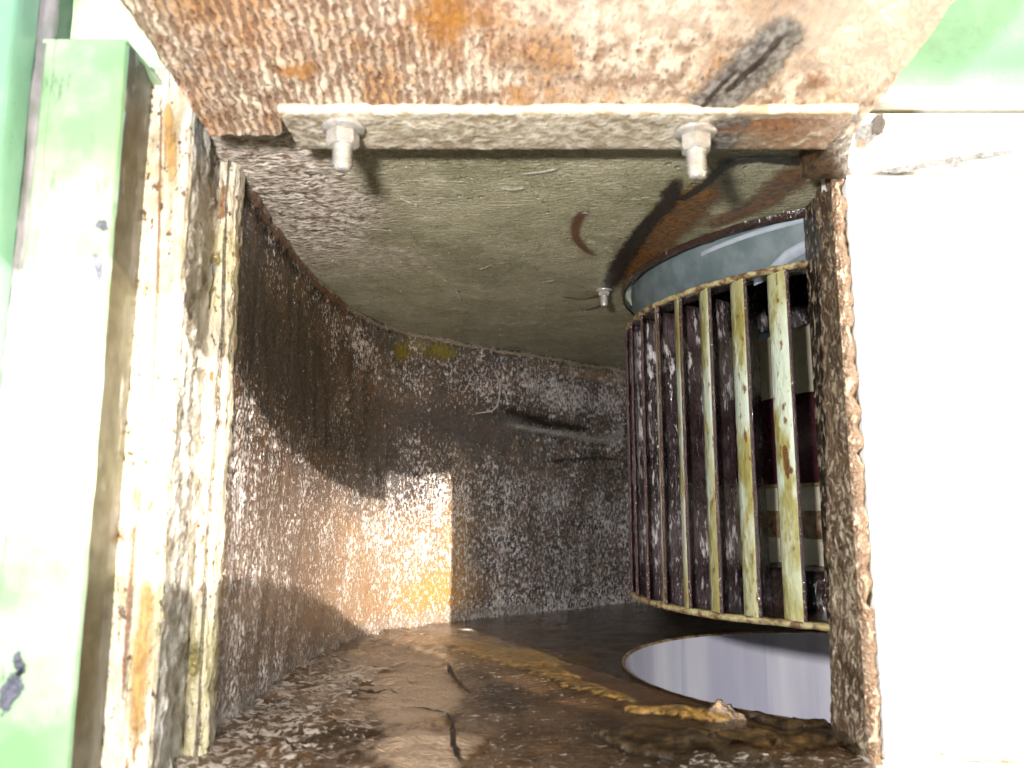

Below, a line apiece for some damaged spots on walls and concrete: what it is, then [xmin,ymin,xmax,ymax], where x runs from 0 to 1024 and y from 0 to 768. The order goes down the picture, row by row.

water stain [701,36,785,108]
rust [808,75,825,89]
rust [729,117,806,136]
water stain [506,409,588,430]
rust [122,528,152,742]
peeling [0,651,26,716]
crack [447,663,473,694]
crack [346,688,460,761]